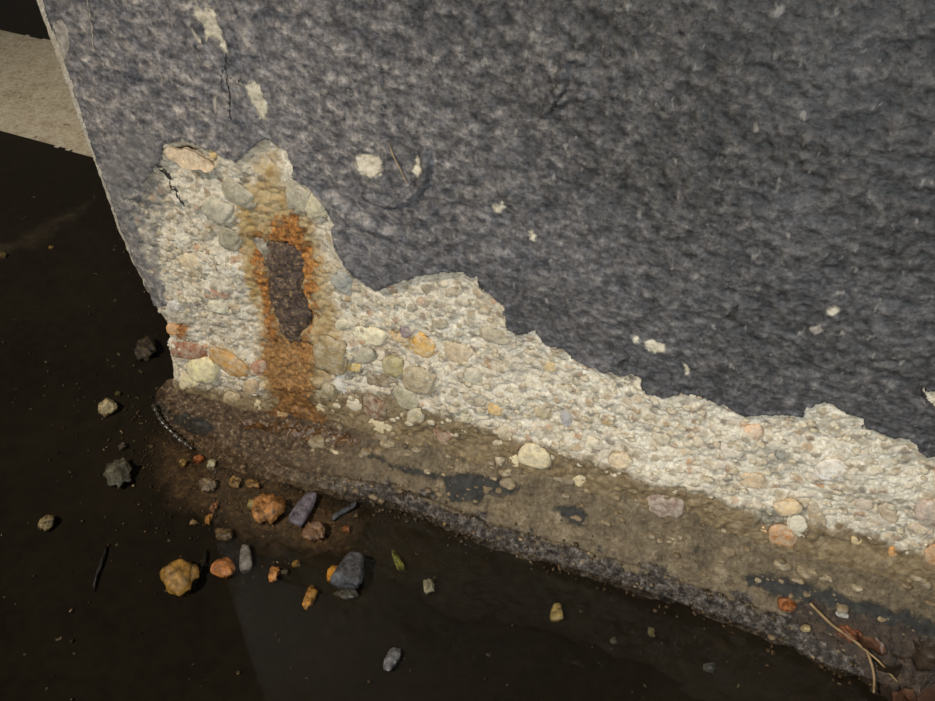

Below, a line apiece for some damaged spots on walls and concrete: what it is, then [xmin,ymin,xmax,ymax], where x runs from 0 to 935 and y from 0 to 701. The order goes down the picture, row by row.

corrosion [238,165,358,445]
spalling [37,0,935,565]
damp [170,413,214,436]
damp [368,454,519,504]
damp [553,506,587,526]
damp [745,574,935,640]